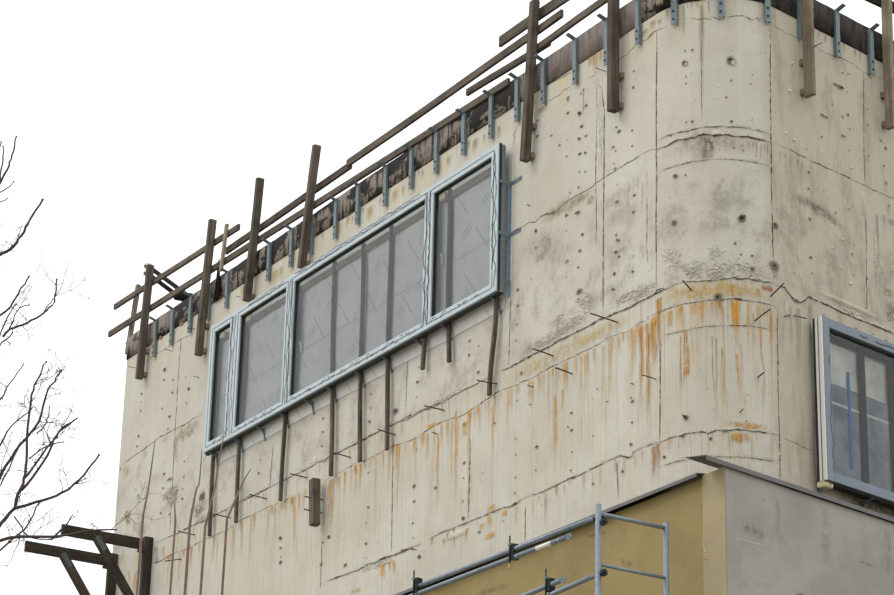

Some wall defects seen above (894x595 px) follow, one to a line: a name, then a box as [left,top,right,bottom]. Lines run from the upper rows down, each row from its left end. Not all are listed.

crack [512,124,892,232]
rust [618,300,689,395]
rust [684,283,773,355]
rust [382,385,518,469]
crack [136,275,810,581]